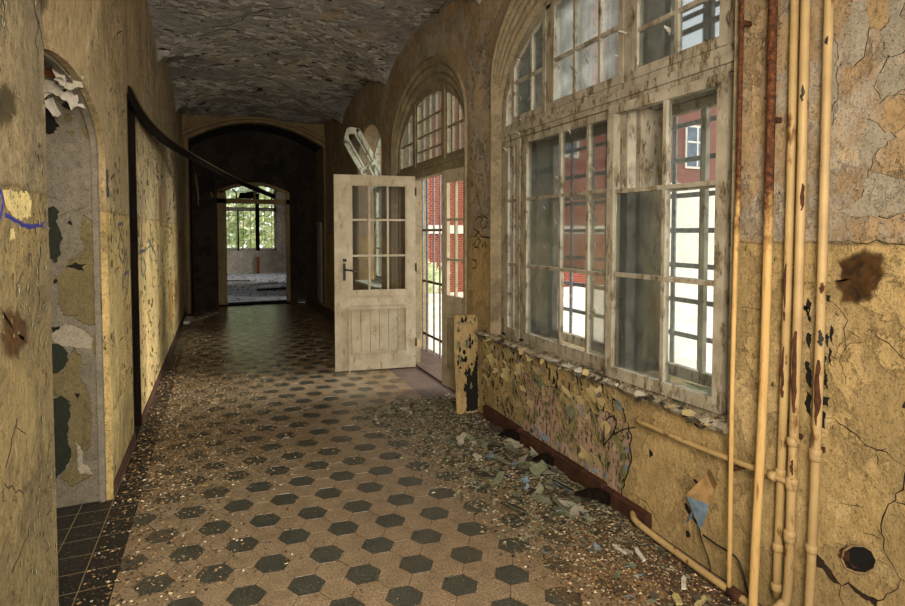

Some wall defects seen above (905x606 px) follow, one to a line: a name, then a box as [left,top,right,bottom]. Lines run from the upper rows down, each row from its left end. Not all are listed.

peeling [800,0,905,125]
flaking render [44,67,90,141]
crack [830,209,905,246]
water stain [835,250,884,304]
peeling [0,128,185,582]
peeling [771,298,840,430]
crack [826,302,905,381]
peeling [395,315,632,553]
peeling [684,468,718,537]
crack [823,418,905,606]
flaking render [816,555,878,606]
spalling [838,543,878,575]